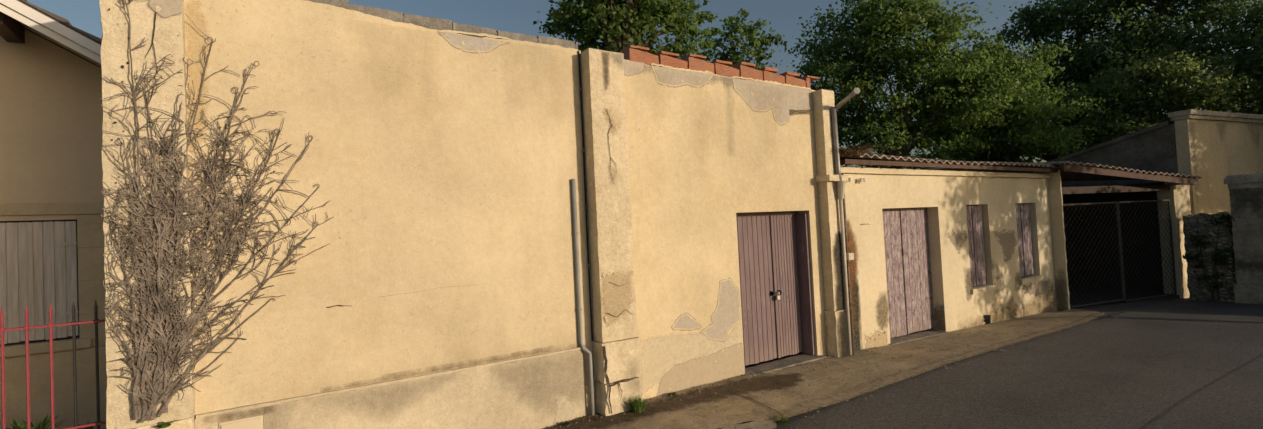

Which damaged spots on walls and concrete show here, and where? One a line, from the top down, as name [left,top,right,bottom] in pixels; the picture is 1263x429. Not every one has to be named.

flaking render [437,30,511,55]
flaking render [624,60,713,88]
flaking render [732,76,813,126]
flaking render [657,278,745,396]
leakage [834,232,861,357]
leakage [877,296,888,328]